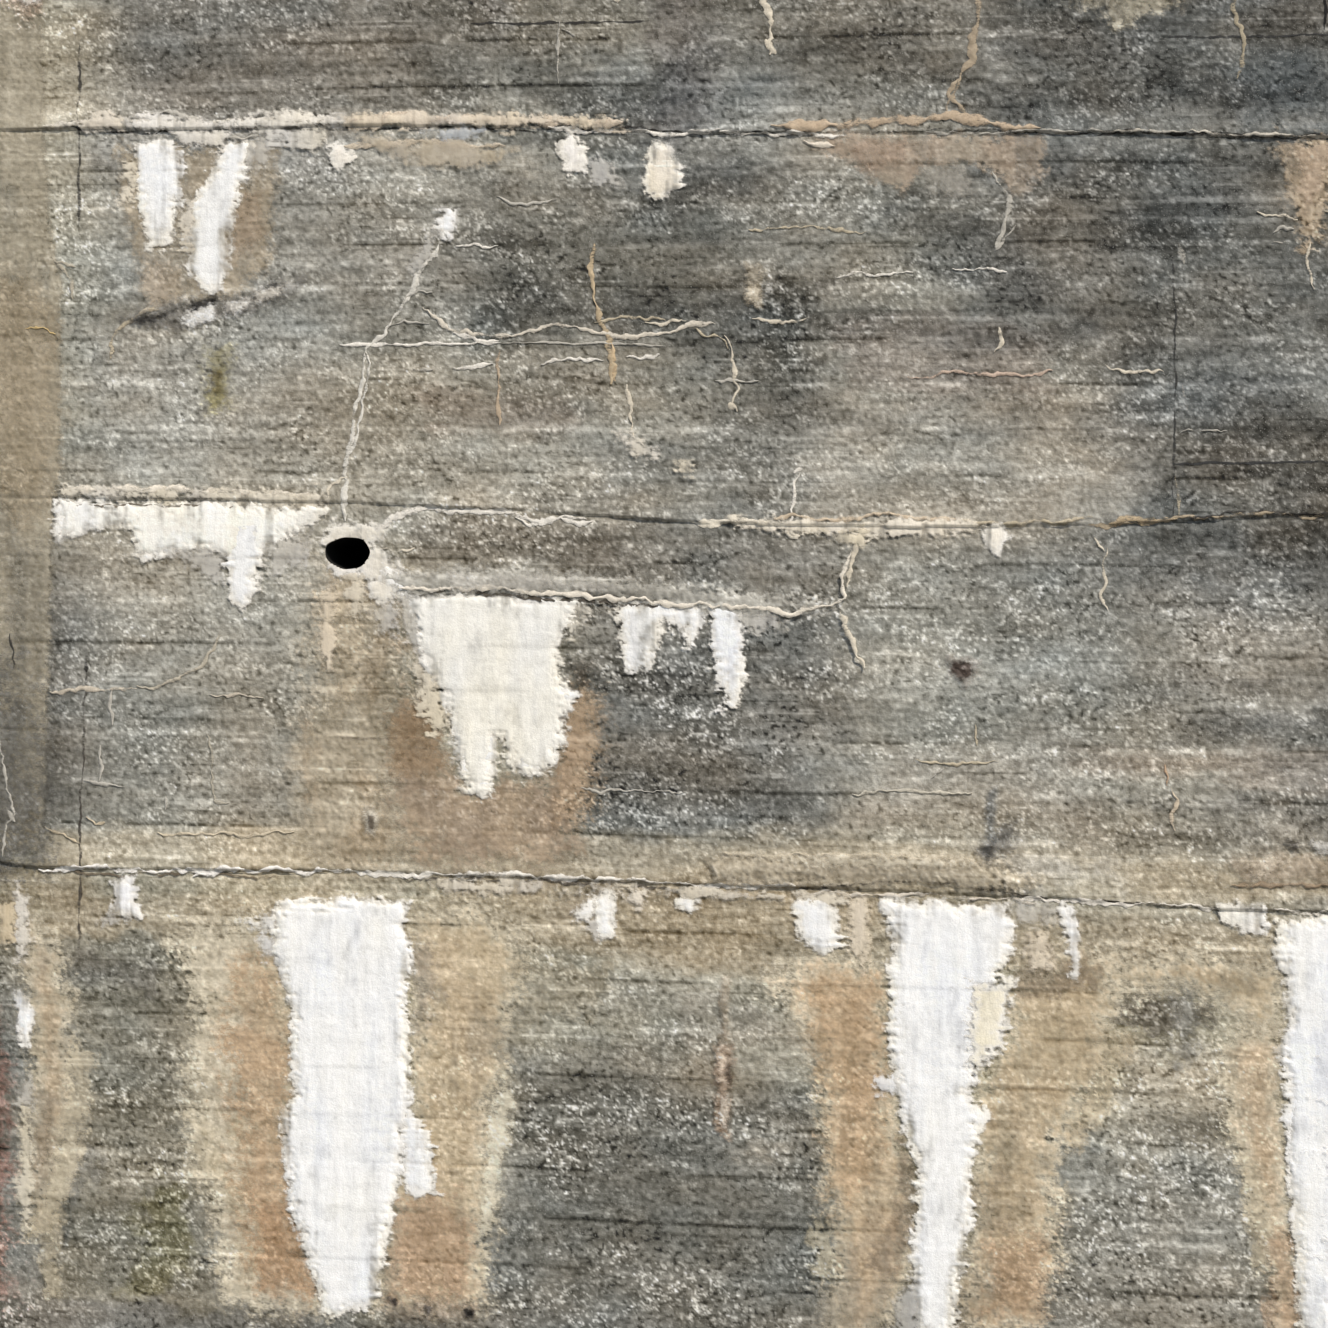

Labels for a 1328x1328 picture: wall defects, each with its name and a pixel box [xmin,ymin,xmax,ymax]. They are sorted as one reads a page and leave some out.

damp [0,0,776,963]
crack [54,243,808,553]
crack [43,0,1328,220]
crack [749,225,867,234]
crack [400,247,1328,668]
damp [728,513,1012,557]
crack [952,171,1016,273]
crack [1257,211,1314,288]
damp [14,994,36,1048]
efflorescence [239,893,444,1319]
efflorescence [431,874,1081,1328]
efflorescence [1216,898,1328,1328]